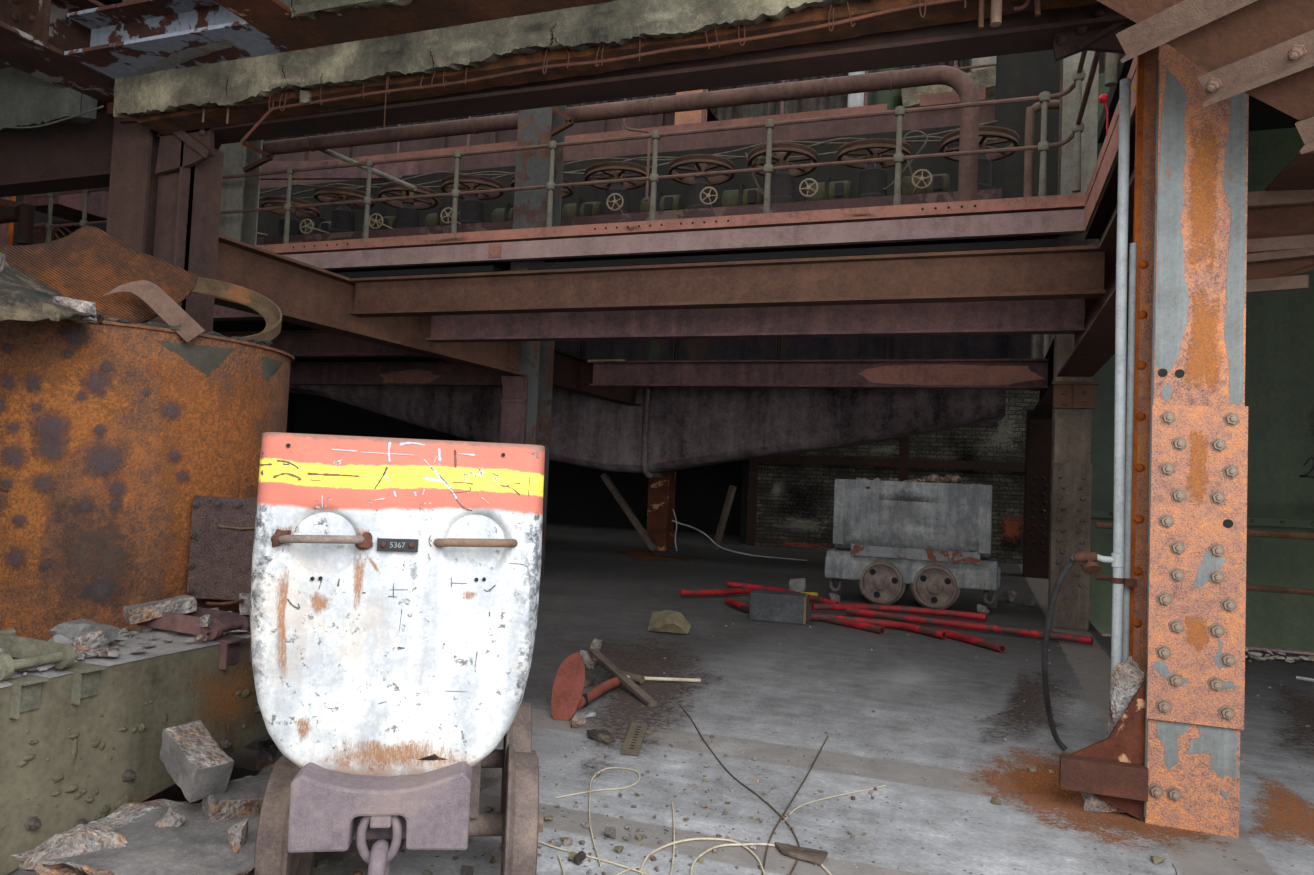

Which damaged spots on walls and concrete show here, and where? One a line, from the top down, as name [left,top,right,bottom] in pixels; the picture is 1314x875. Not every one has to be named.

rust [1188,125,1218,266]
rust [1185,290,1222,392]
rust [1186,432,1208,501]
rust [1185,617,1209,651]
rust [971,672,1221,847]
peeling [1156,721,1239,801]
rust [1249,778,1314,846]